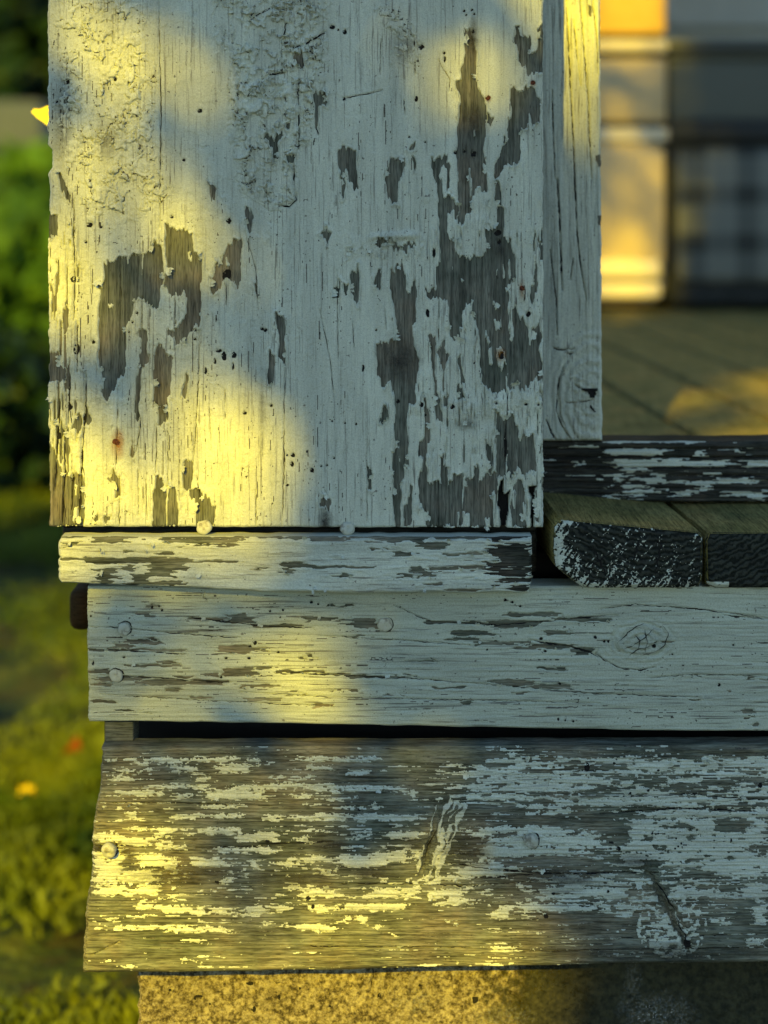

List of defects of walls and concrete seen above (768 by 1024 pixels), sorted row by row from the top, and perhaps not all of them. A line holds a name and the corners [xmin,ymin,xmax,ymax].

peeling [46,25,556,593]
peeling [560,441,768,502]
peeling [553,520,729,588]
peeling [187,613,379,629]
peeling [423,611,612,655]
peeling [88,639,325,690]
peeling [487,679,574,690]
crack [85,538,768,985]
peeling [88,745,768,970]